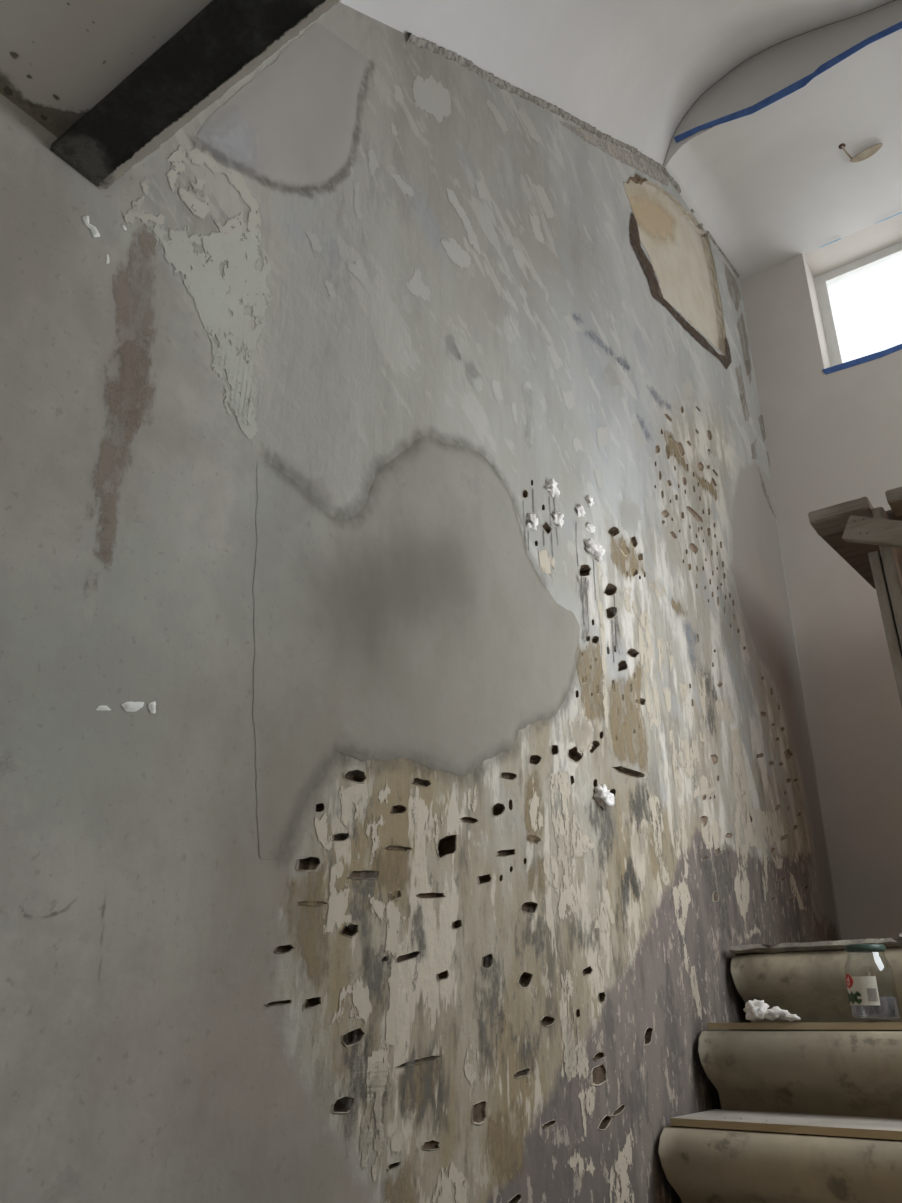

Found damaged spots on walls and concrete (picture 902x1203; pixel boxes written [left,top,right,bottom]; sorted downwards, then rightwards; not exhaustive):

spalling [406,32,776,517]
water stain [253,435,596,860]
peeling [496,379,902,1019]
water stain [703,673,717,733]
peeling [296,769,412,938]
water stain [412,906,426,951]
water stain [616,858,641,931]
water stain [629,781,653,830]
peeling [329,893,441,1182]
water stain [345,1036,443,1134]
peeling [540,955,634,1203]
peeling [432,1161,468,1203]